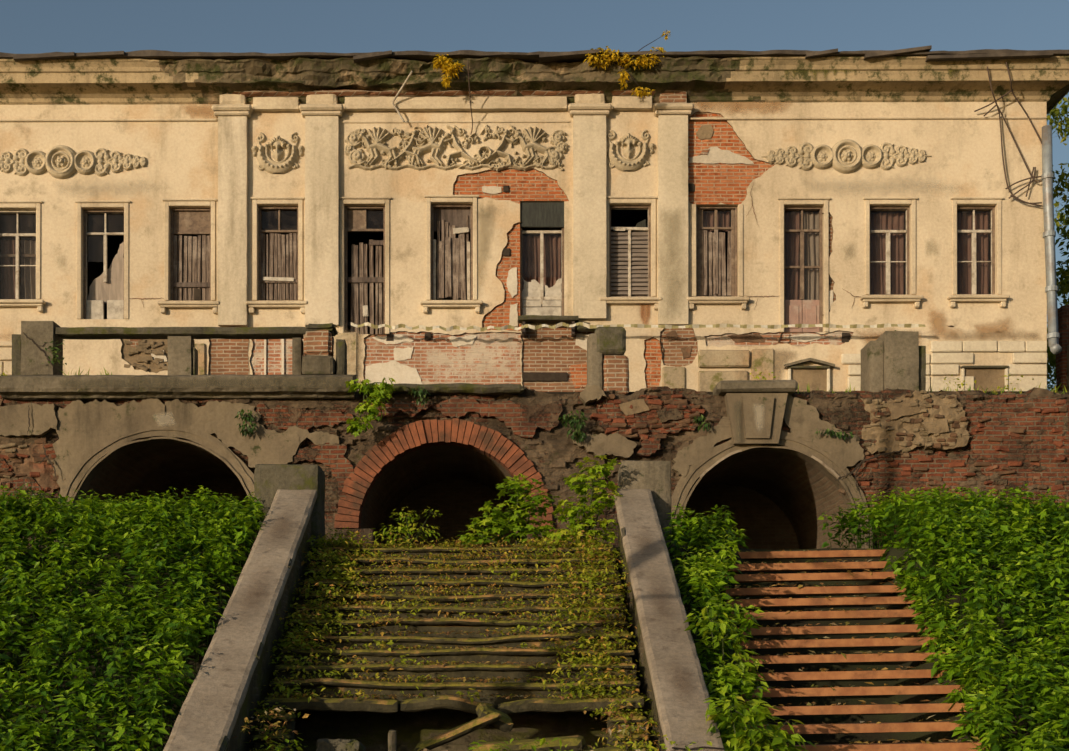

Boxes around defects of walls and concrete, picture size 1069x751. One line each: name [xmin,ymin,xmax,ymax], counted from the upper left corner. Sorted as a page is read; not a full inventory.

spalling [453,168,569,204]
spalling [688,111,775,206]
spalling [120,339,168,373]
spalling [256,402,355,430]
spalling [293,443,356,499]
spalling [362,221,595,438]
spalling [590,328,882,458]
spalling [852,396,1069,509]